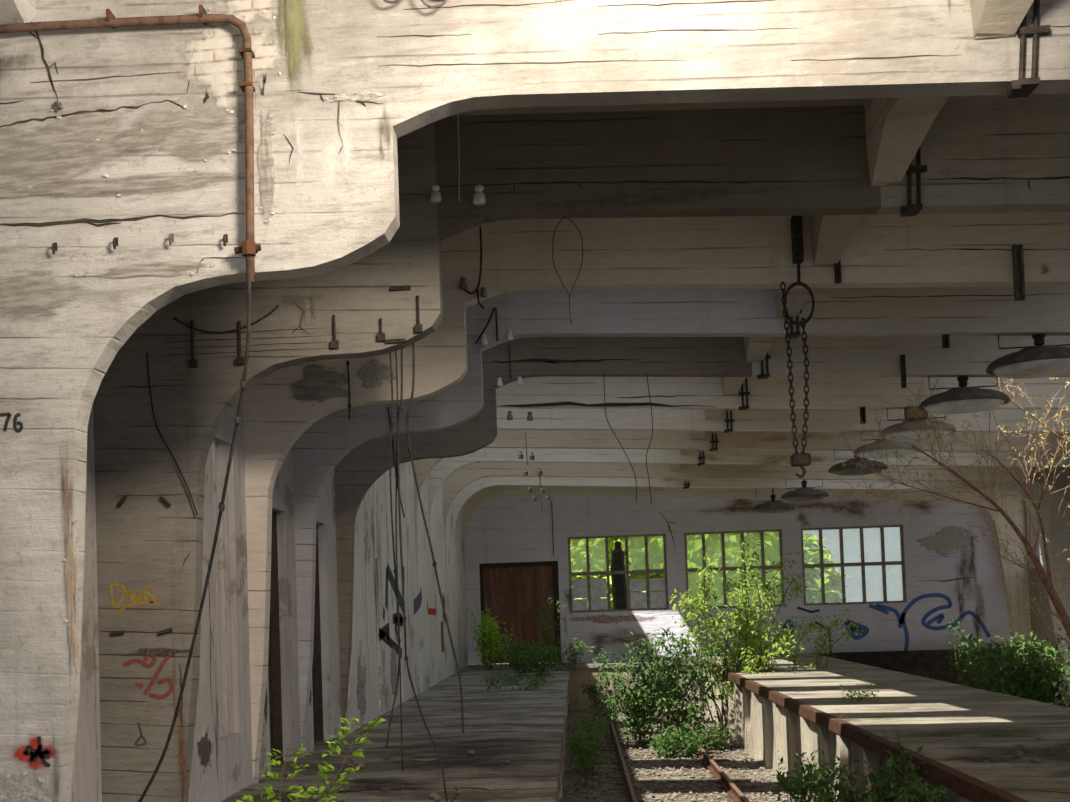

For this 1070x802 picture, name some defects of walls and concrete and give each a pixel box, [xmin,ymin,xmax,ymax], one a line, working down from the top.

damp [278,2,295,80]
crack [0,31,209,128]
crack [928,176,1070,191]
crack [0,212,245,227]
corrosion [62,475,72,510]